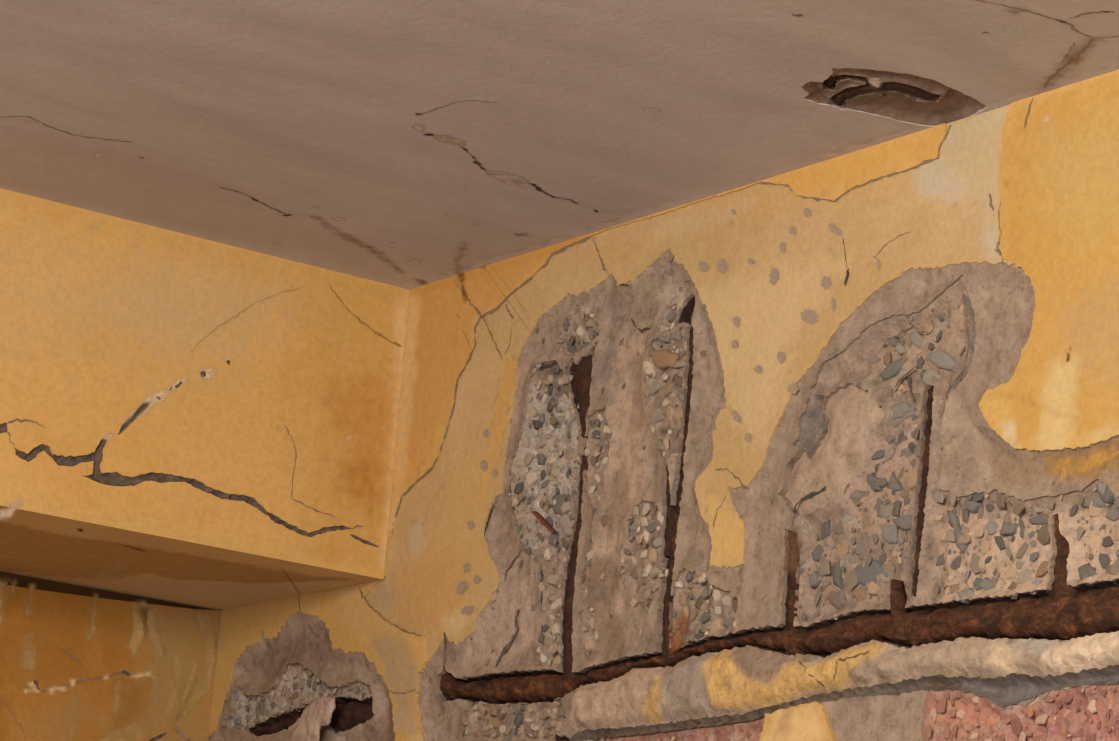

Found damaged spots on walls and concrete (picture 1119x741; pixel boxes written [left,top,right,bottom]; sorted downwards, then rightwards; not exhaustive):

crack [1,116,128,142]
crack [413,100,631,286]
rust [824,74,951,106]
crack [976,0,1119,129]
crack [329,284,402,347]
crack [454,280,514,359]
crack [0,288,379,547]
spalling [366,68,1119,741]
rust [440,308,1119,705]
crack [149,732,167,741]
spalling [210,612,396,741]